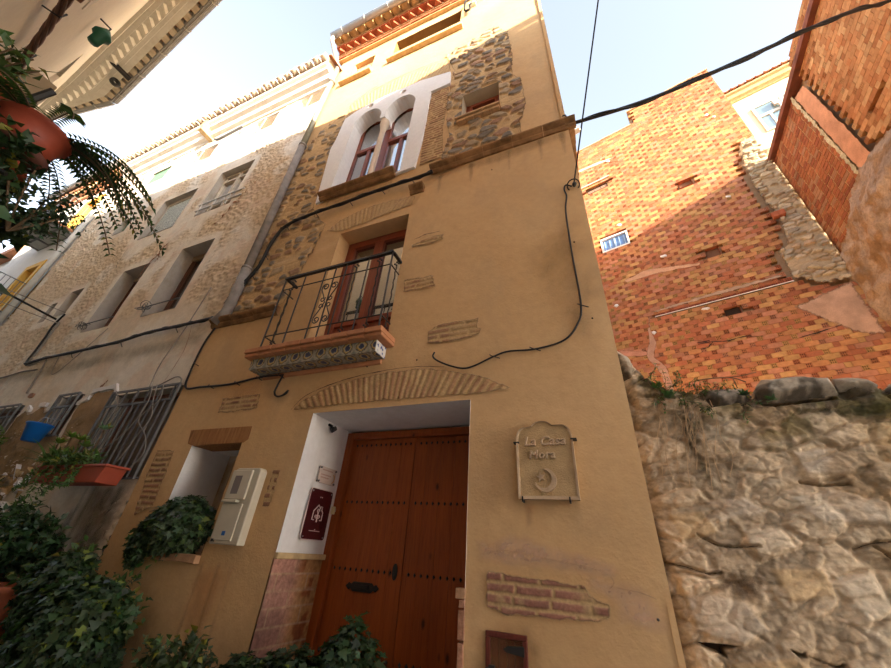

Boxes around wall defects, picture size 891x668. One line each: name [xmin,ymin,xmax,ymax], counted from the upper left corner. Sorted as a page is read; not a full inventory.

flaking render [487,572,609,622]